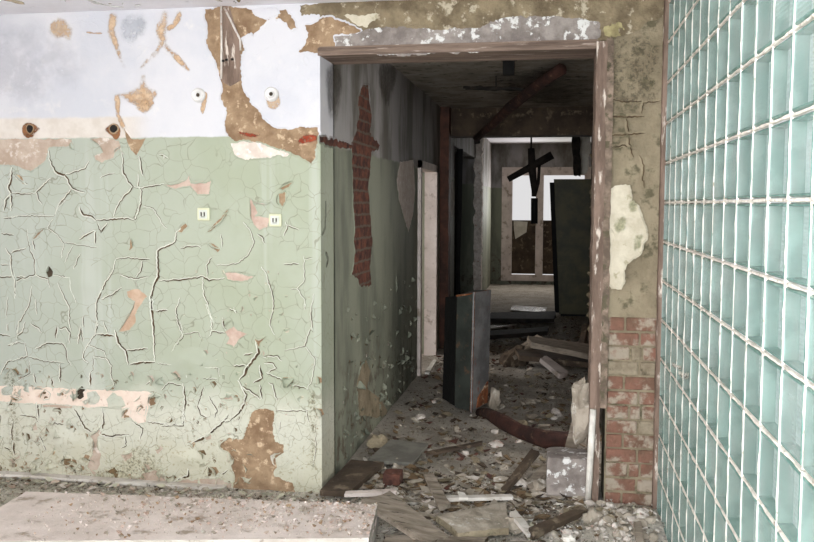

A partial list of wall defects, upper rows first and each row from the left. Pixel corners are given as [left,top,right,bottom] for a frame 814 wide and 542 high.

peeling [0,137,75,186]
peeling [90,127,147,164]
flaking render [203,0,664,290]
crack [0,146,329,465]
peeling [0,384,160,425]
flaking render [86,406,297,492]
crack [173,468,229,482]